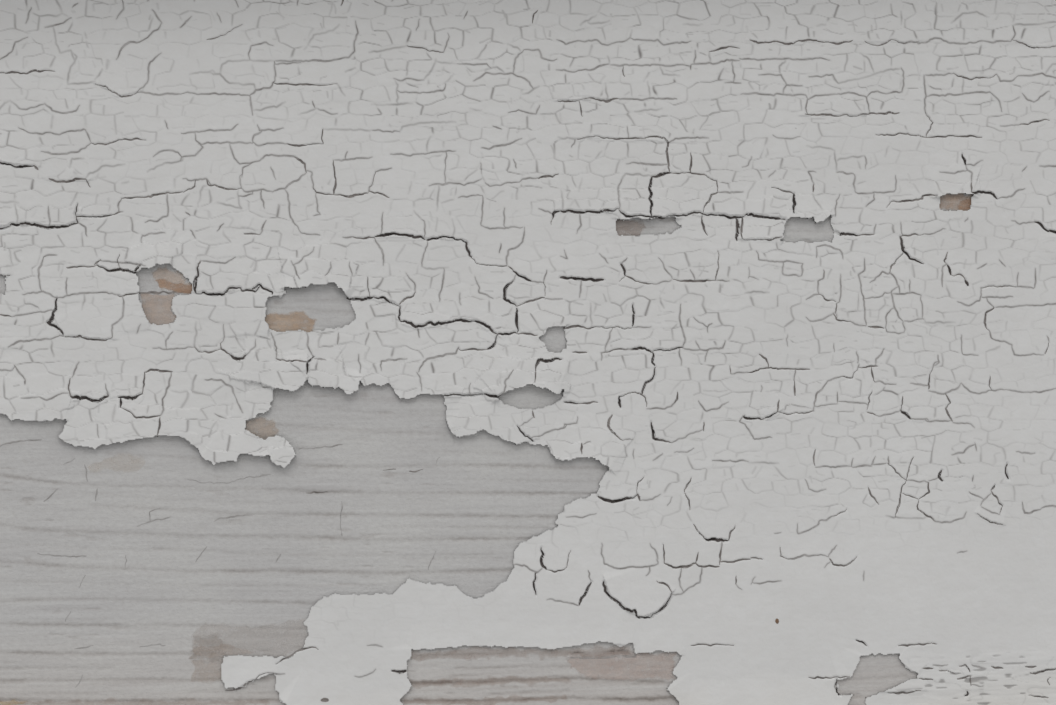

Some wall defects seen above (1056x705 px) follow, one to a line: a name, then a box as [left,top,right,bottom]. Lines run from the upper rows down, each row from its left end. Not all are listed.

peeling [617,216,682,237]
peeling [780,215,840,243]
peeling [940,193,973,211]
crack [0,0,1056,525]
peeling [135,263,196,325]
peeling [265,282,356,332]
crack [513,305,864,619]
peeling [0,358,918,705]